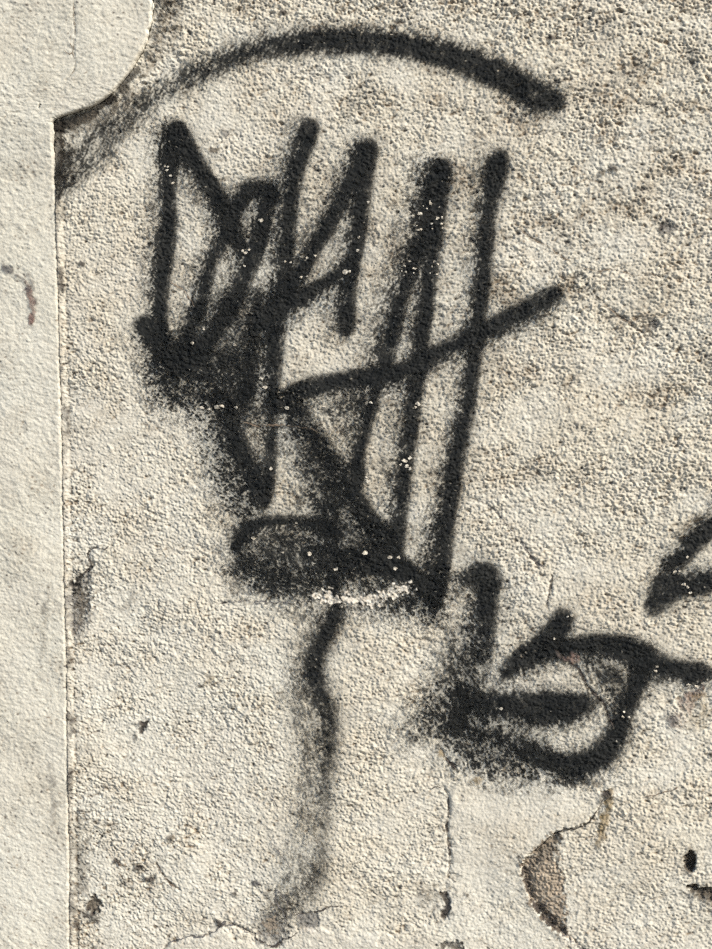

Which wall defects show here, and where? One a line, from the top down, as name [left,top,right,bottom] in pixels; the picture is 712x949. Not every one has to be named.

spalling [517,800,603,949]
spalling [687,884,712,904]
crack [165,921,255,948]